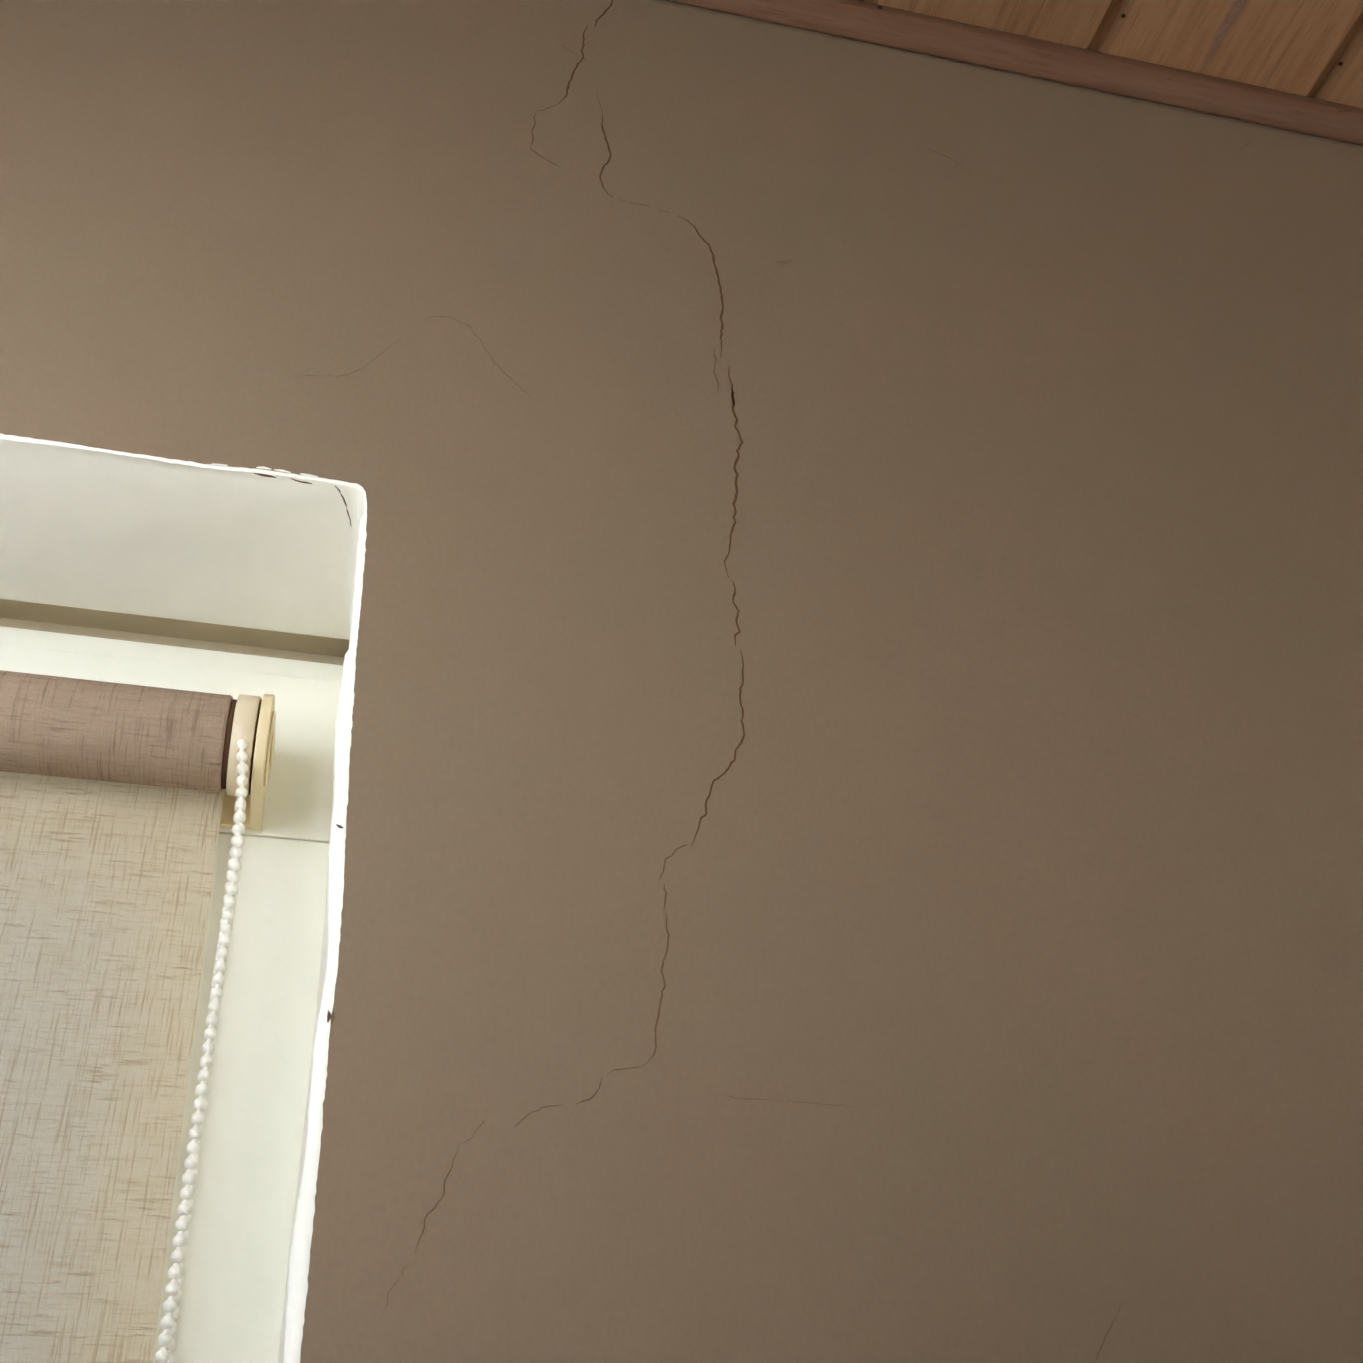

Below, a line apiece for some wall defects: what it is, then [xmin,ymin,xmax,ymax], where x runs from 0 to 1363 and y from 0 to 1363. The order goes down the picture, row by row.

crack [385,0,745,1309]